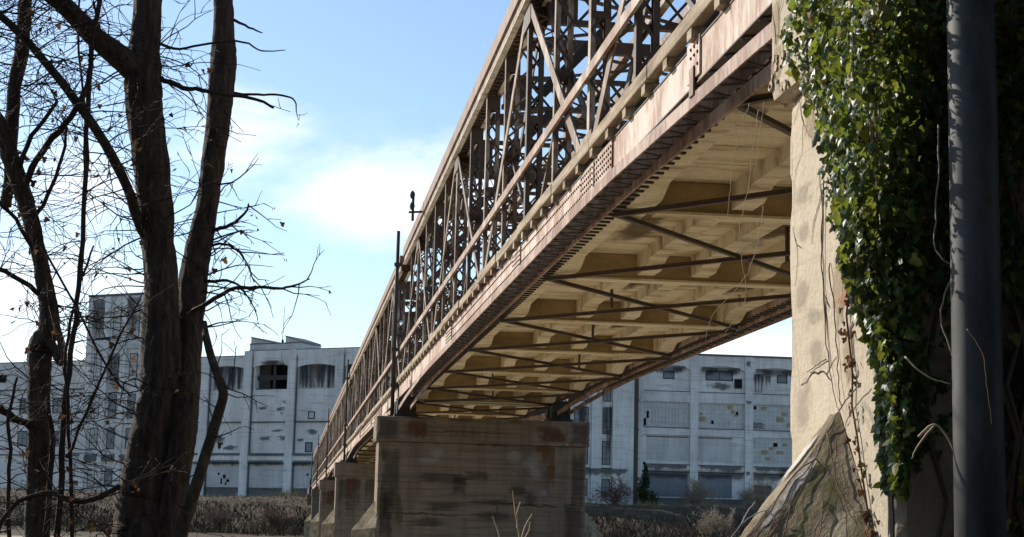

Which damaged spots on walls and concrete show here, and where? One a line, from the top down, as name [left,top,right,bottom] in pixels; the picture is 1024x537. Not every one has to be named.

crack [793,98,836,385]
crack [471,501,555,518]